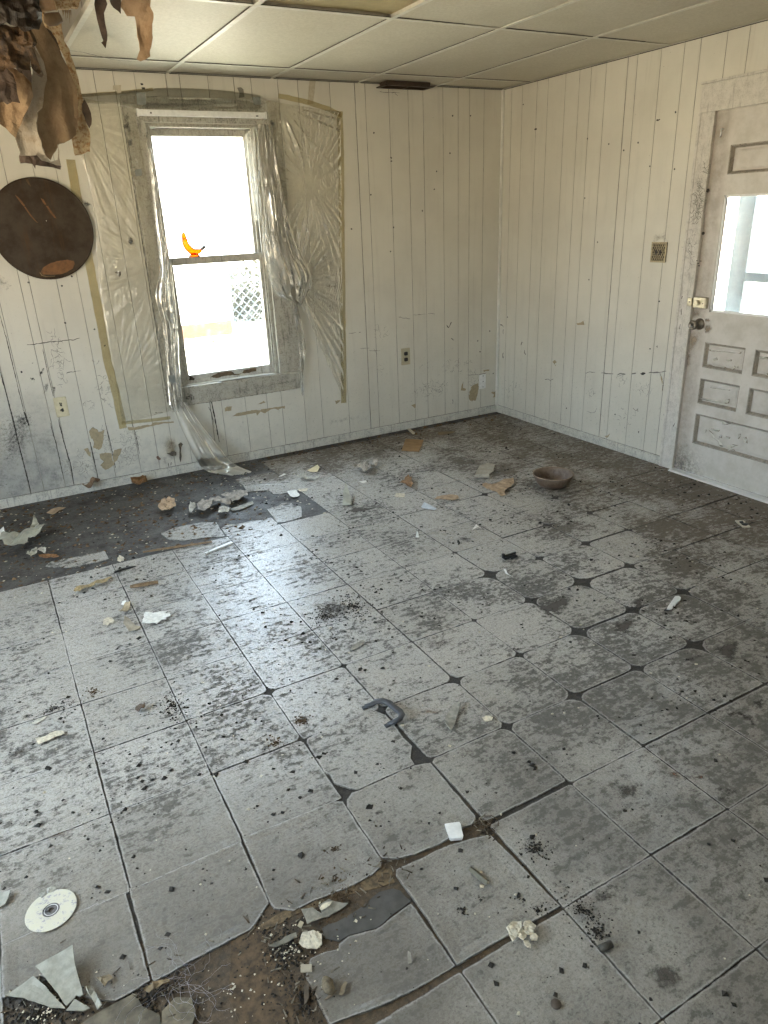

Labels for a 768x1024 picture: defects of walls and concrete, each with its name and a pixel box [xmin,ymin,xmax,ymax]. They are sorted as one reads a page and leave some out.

peeling [461,383,479,402]
peeling [225,401,285,416]
peeling [84,427,122,470]
flaking render [299,930,322,949]